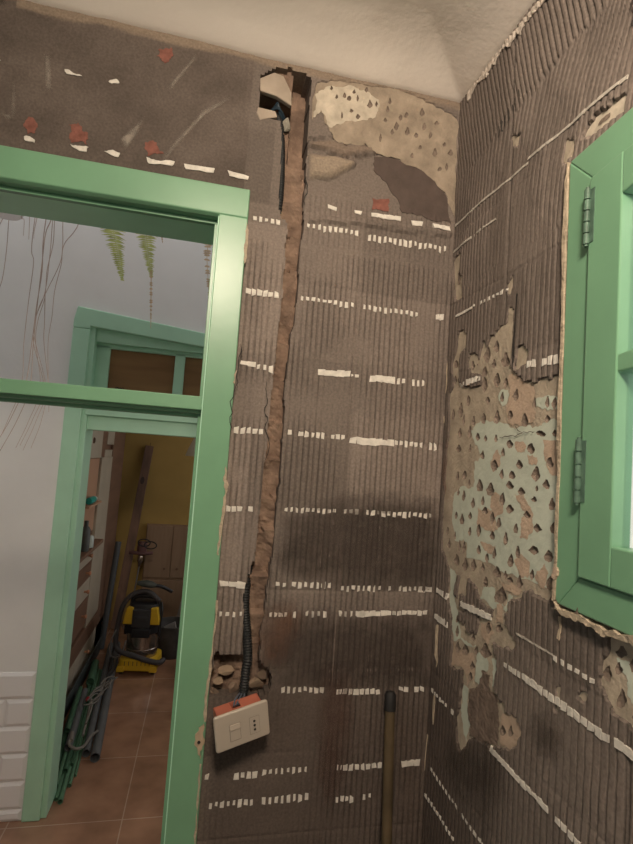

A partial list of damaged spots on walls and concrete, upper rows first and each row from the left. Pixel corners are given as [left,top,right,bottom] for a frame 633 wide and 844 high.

peeling [585,95,627,137]
spalling [312,81,459,216]
peeling [307,223,358,236]
peeling [368,235,446,253]
crack [229,348,242,432]
crack [263,382,271,460]
peeling [288,430,345,440]
peeling [395,140,633,750]
peeling [284,507,431,519]
peeling [337,762,382,771]
peeling [424,734,483,844]